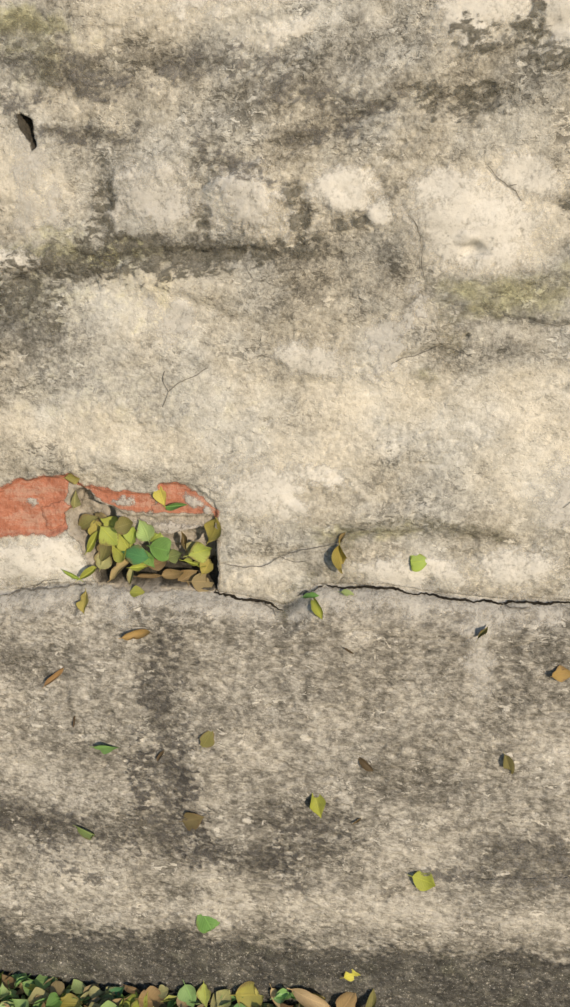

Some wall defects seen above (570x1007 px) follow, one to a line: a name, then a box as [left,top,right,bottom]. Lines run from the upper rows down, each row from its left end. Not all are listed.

spalling [16,114,37,150]
crack [0,579,92,596]
spalling [0,454,346,593]
crack [214,514,369,616]
crack [314,577,570,609]
leakage [0,917,570,1007]